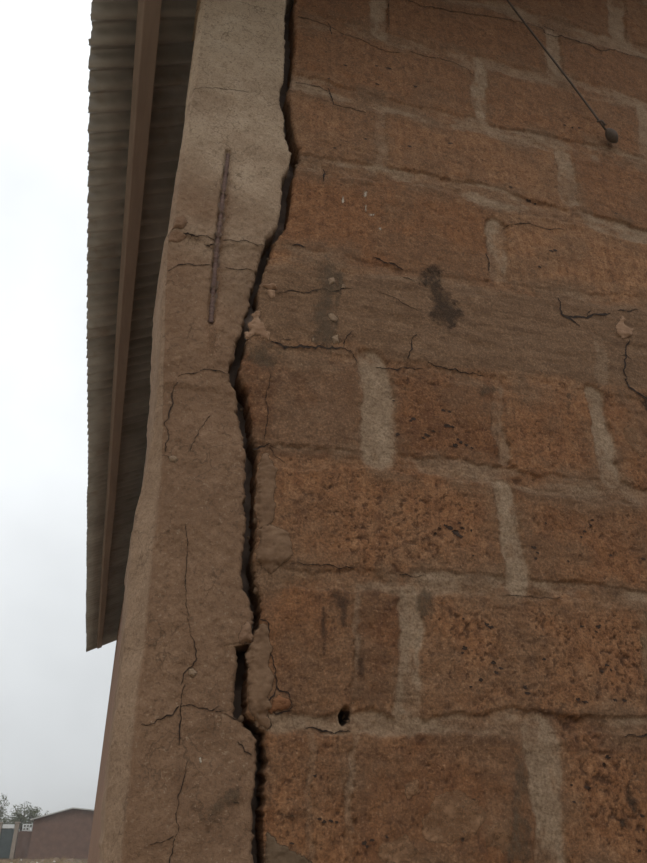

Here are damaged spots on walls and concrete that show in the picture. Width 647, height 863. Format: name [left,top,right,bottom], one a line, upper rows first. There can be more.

crack [279,0,473,136]
damp [421,265,462,327]
crack [558,298,632,326]
crack [377,334,483,376]
crack [621,339,647,399]
crack [141,163,357,863]
peeling [264,832,312,863]